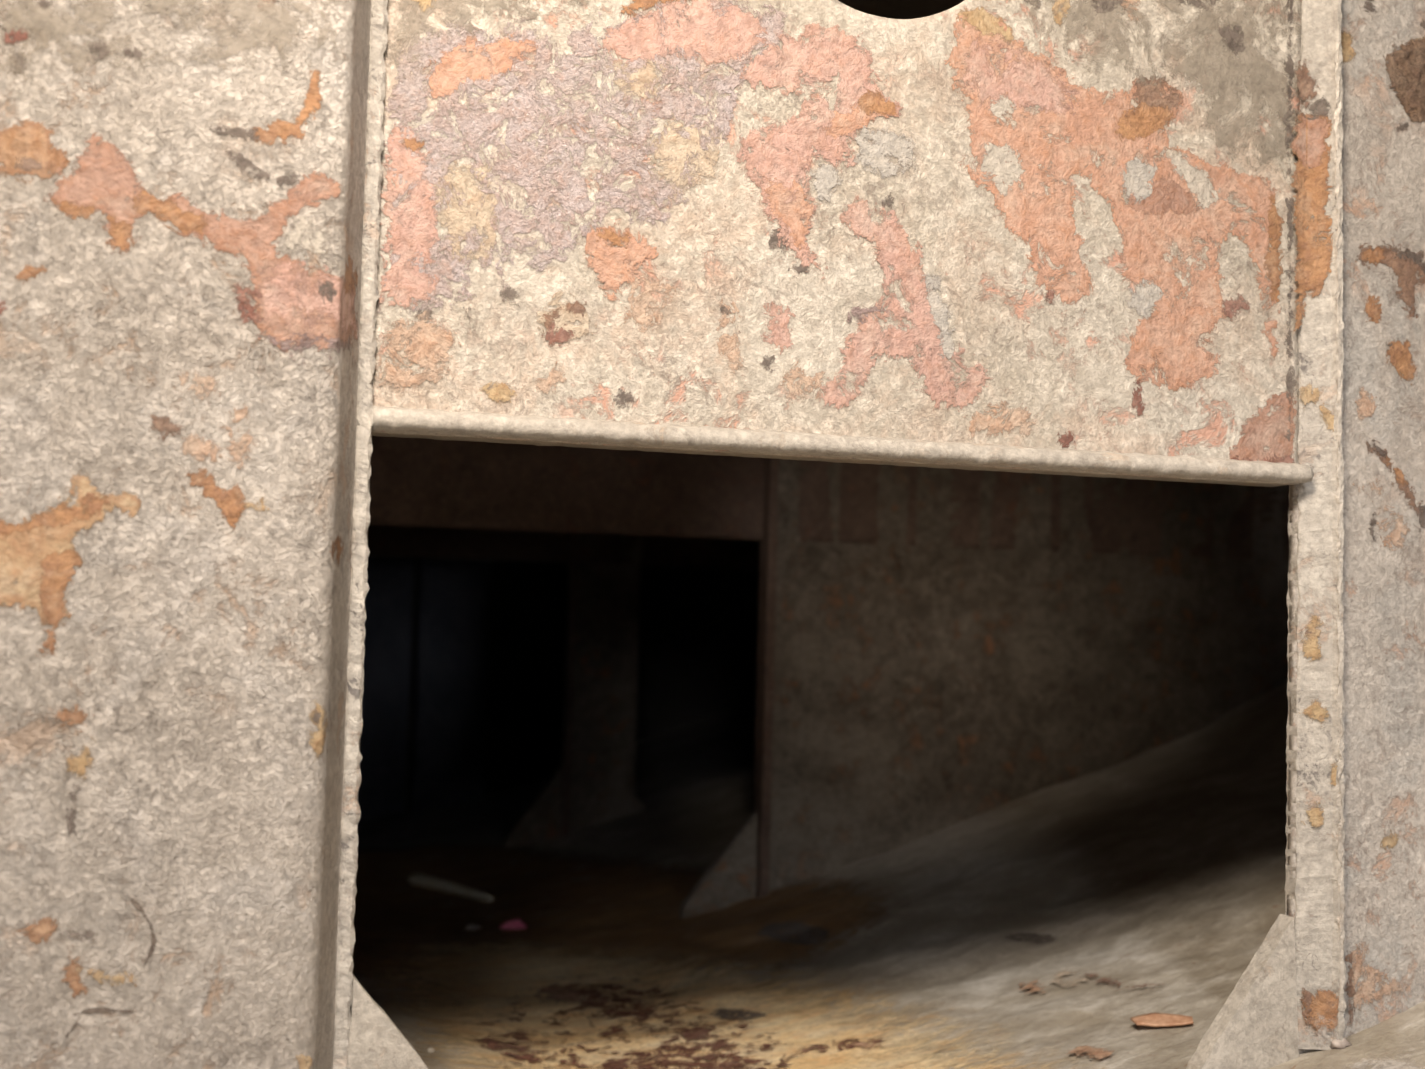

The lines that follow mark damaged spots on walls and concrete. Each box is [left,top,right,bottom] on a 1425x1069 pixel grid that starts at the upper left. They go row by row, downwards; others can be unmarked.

peeling [44,132,358,365]
peeling [376,0,1035,440]
peeling [944,7,1285,392]
corrosion [1287,57,1334,331]
peeling [1229,391,1297,463]
corrosion [352,842,1045,1069]